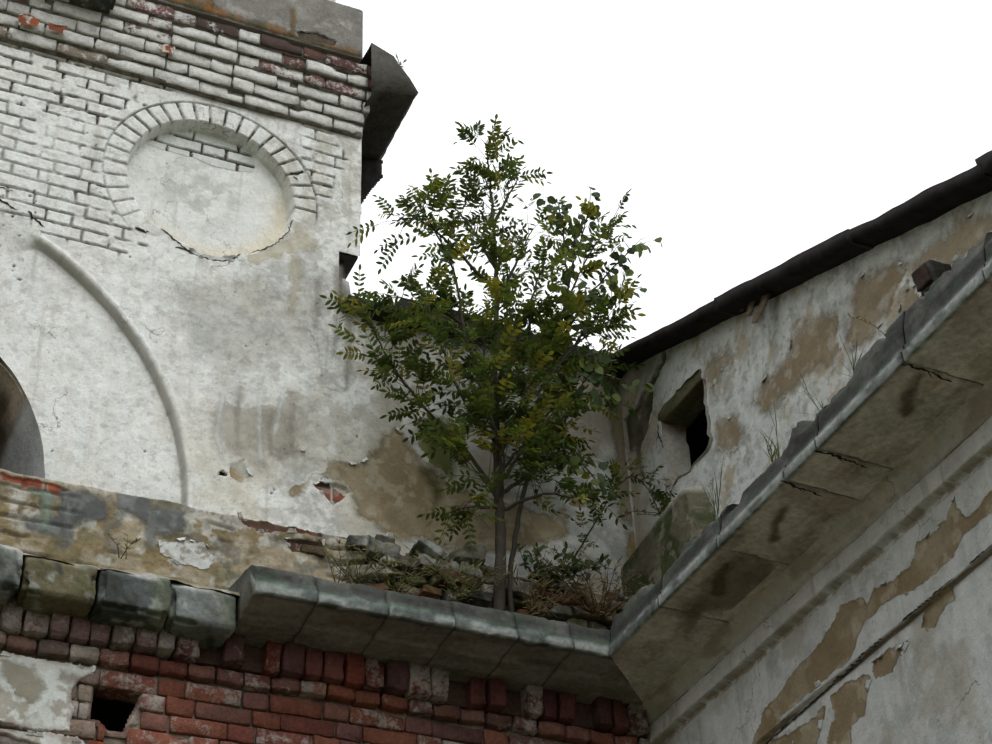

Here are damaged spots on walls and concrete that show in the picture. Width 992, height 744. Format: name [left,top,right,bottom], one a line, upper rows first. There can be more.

crack [135,220,293,261]
peeling [756,212,992,412]
peeling [716,414,744,454]
peeling [289,427,600,551]
peeling [159,537,214,570]
peeling [752,491,992,744]
peeling [0,651,105,744]